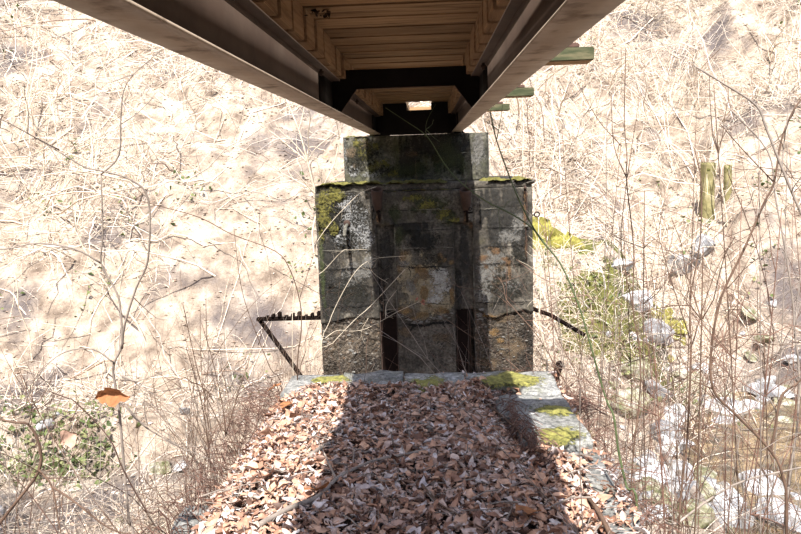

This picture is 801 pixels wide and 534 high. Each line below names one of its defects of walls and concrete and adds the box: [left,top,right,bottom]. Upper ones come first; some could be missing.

peeling [333,194,375,255]
leakage [319,181,530,323]